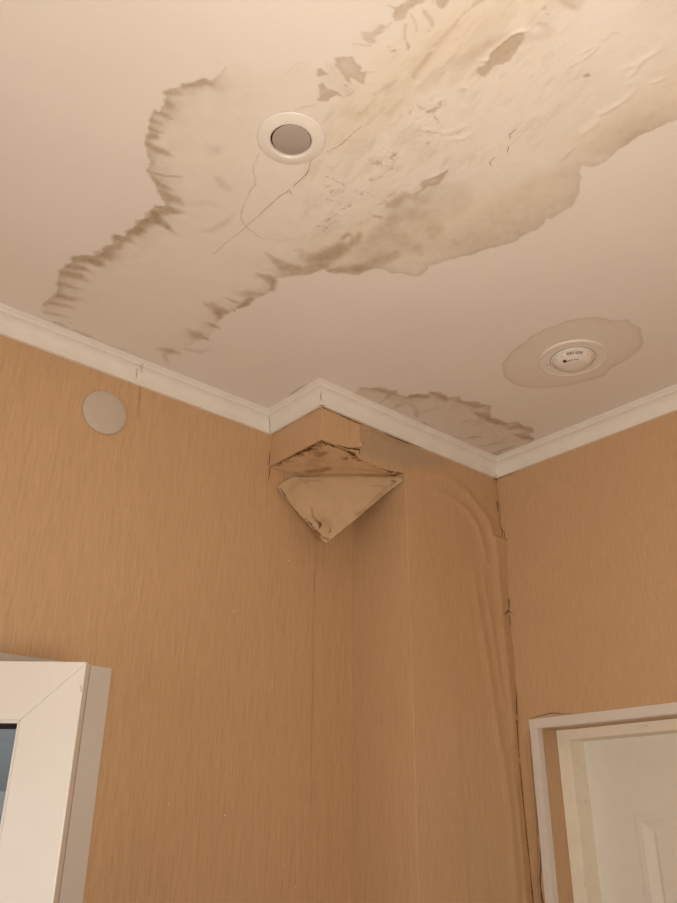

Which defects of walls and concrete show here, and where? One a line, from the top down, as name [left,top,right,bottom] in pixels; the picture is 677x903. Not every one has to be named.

crack [235,125,361,236]
leakage [38,0,677,367]
leakage [501,316,644,389]
leakage [353,385,537,456]